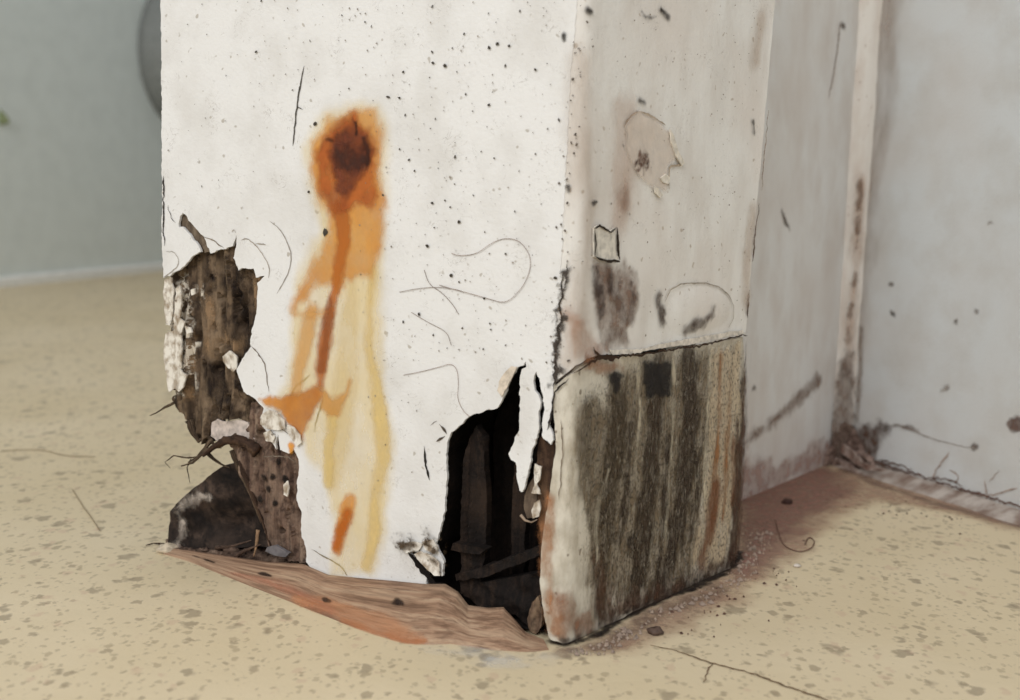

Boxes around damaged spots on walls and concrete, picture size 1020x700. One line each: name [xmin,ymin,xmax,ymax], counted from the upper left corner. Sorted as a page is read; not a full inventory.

crack [752,110,769,262]
peeling [163,277,196,392]
peeling [222,351,238,372]
peeling [211,410,302,447]
corrosion [263,112,385,487]
corrosion [333,496,354,553]
corrosion [363,344,389,569]
spalling [395,365,556,634]
mould [595,264,638,344]
crack [547,265,750,496]
damp [577,308,1002,625]
damp [1007,417,1020,431]